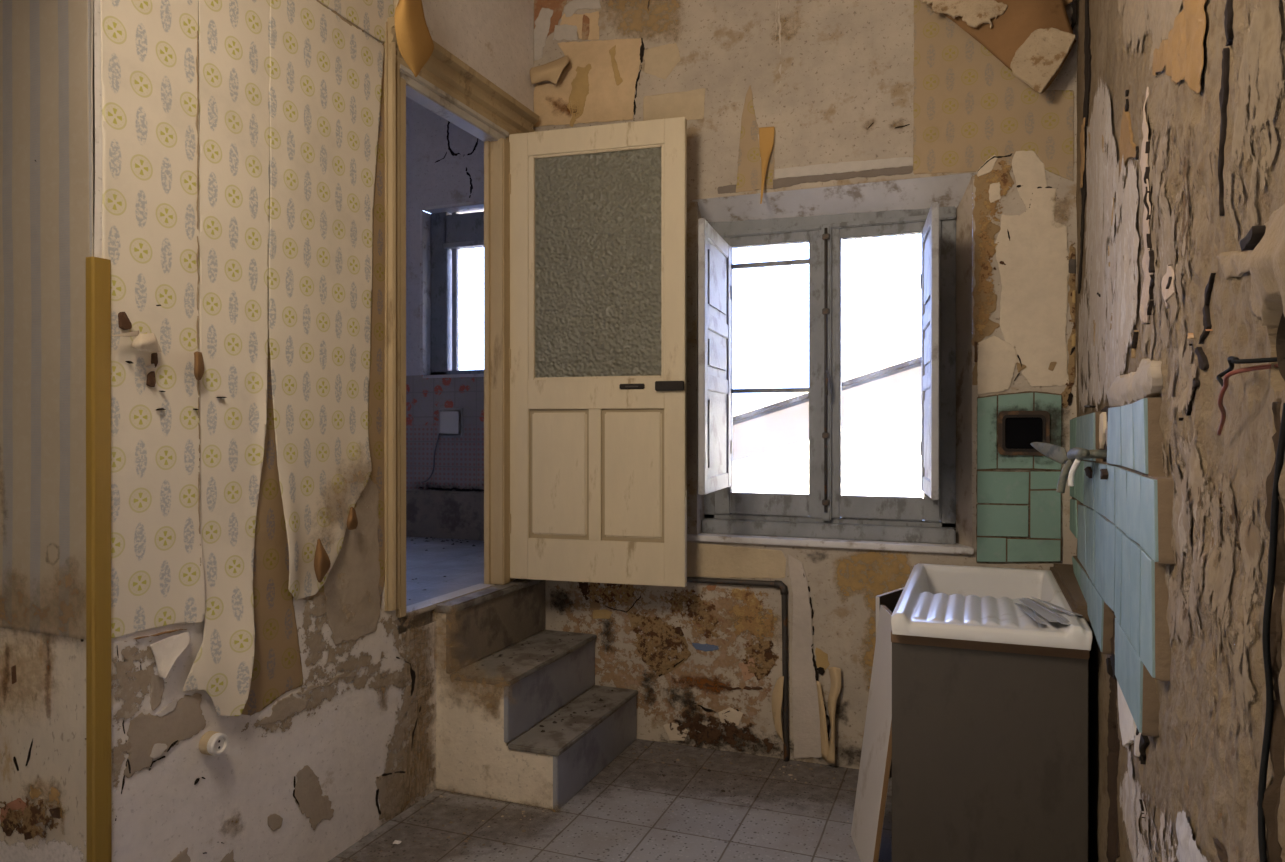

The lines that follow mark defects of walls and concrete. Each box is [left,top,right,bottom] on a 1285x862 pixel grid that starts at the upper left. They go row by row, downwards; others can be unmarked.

crack [435,121,478,198]
spalling [530,0,601,84]
peeling [926,0,1077,94]
crack [1218,0,1234,216]
spalling [971,155,1026,394]
peeling [1048,0,1285,480]
spalling [111,632,206,788]
flaking render [241,477,436,831]
water stain [642,674,791,756]
spalling [1106,611,1178,862]
spalling [0,797,61,840]
spalling [1213,838,1238,862]